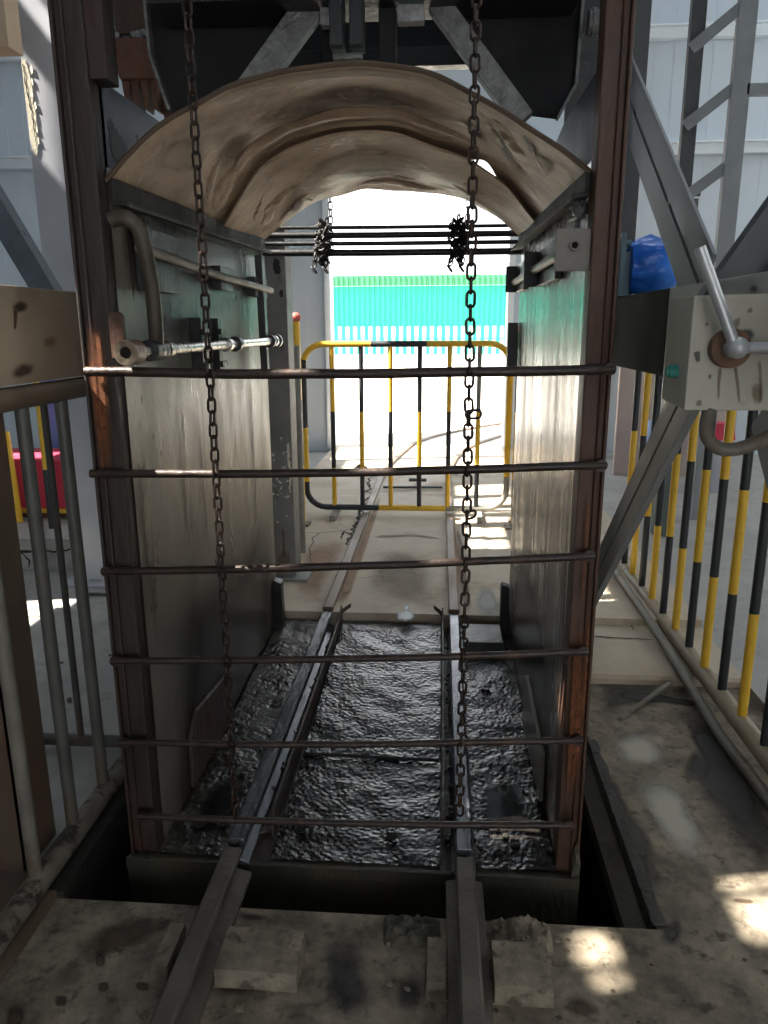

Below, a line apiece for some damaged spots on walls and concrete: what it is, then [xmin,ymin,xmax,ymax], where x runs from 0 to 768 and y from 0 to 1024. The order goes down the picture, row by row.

rust [91,337,110,470]
crack [308,476,375,562]
spalling [383,914,441,949]
spalling [486,914,562,965]